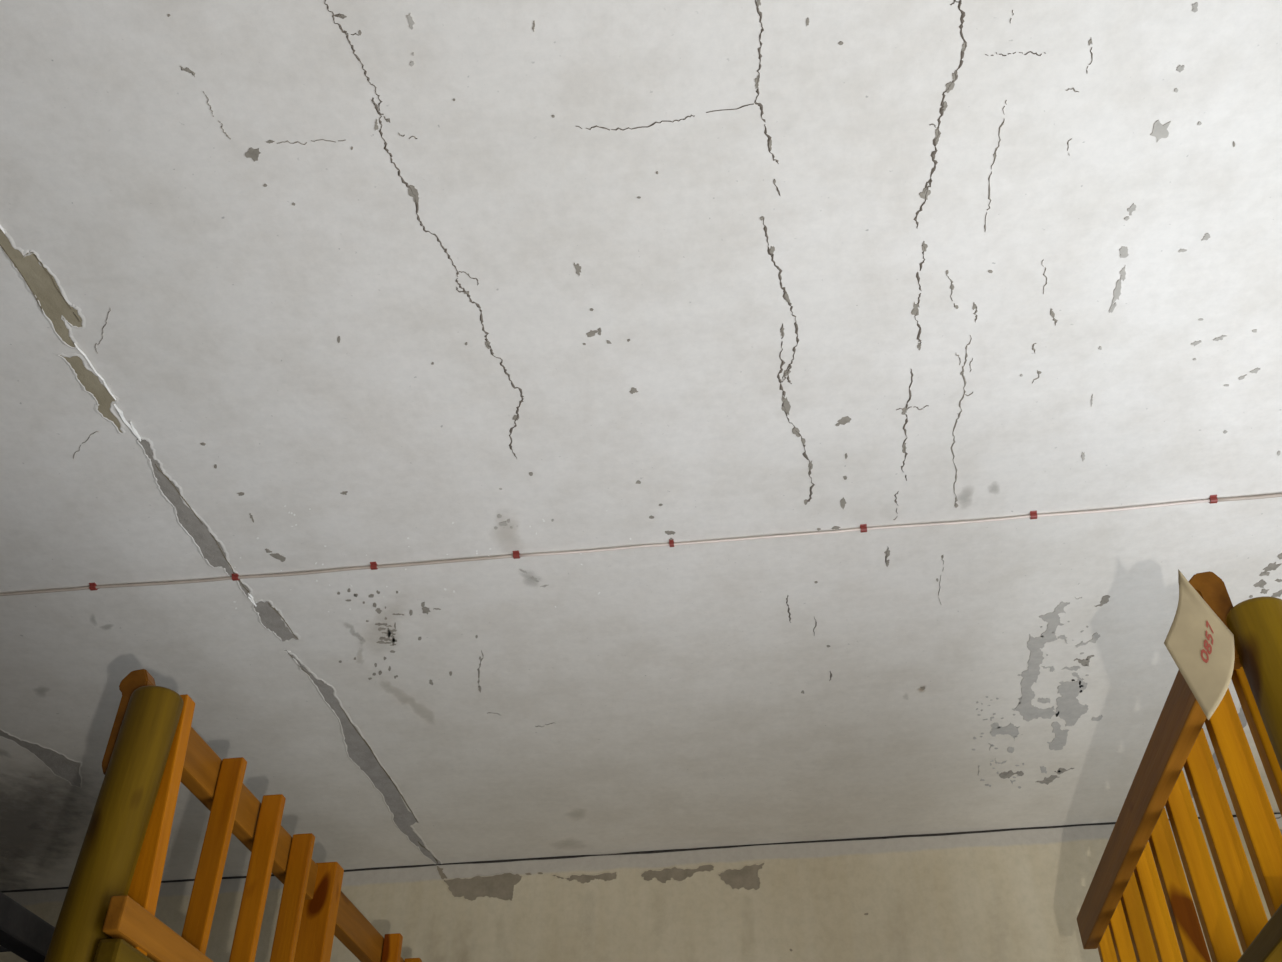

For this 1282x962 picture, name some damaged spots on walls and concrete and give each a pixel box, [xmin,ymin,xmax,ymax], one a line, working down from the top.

crack [180,0,533,476]
crack [576,0,815,505]
crack [884,0,1046,567]
flaking render [0,224,617,901]
flaking render [641,863,764,890]
peeling [972,597,1103,789]
flaking render [1237,704,1247,728]
peeling [1249,553,1282,598]